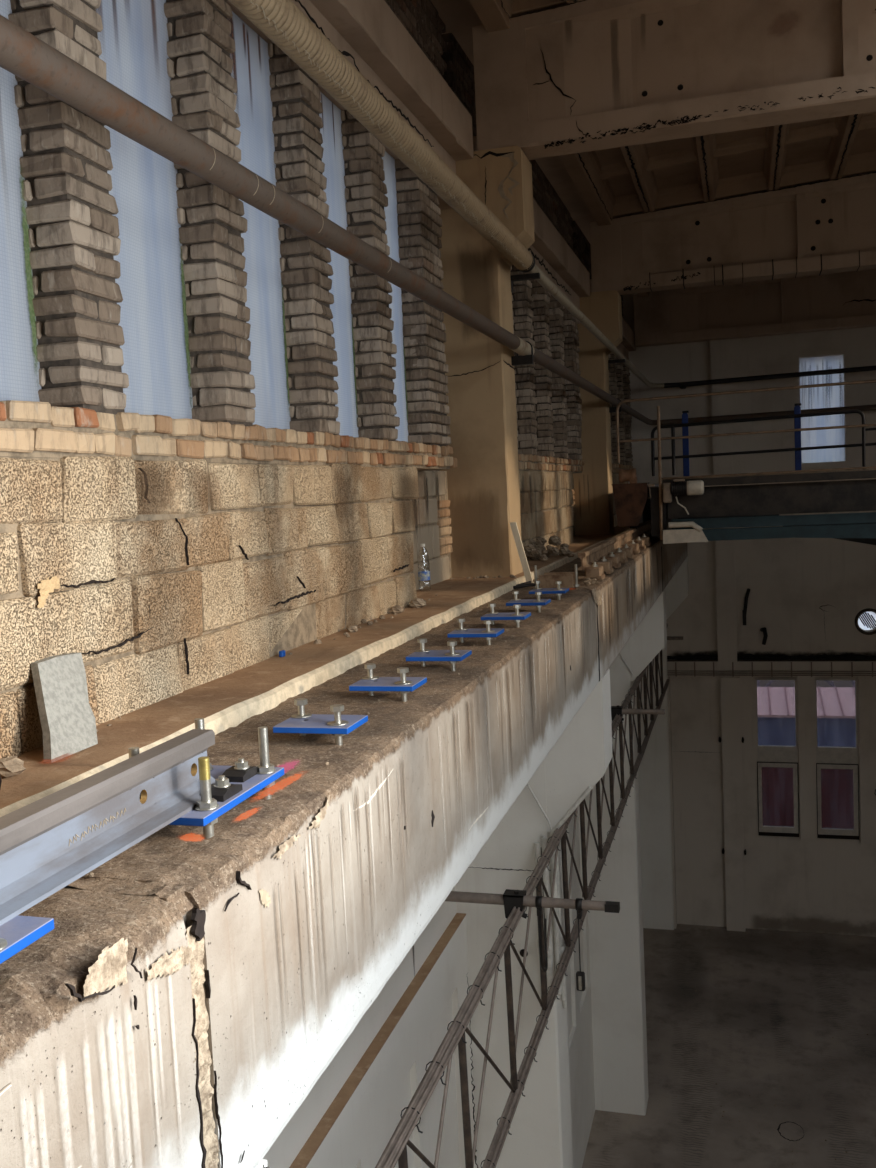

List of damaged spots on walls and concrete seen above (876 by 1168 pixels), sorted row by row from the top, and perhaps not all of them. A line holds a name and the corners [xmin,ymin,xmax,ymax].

crack [533,51,876,221]
crack [138,468,151,503]
crack [175,518,189,565]
crack [62,578,115,588]
crack [274,576,316,606]
crack [81,606,153,654]
crack [182,638,190,674]
spalling [83,938,128,997]
spalling [146,908,206,981]